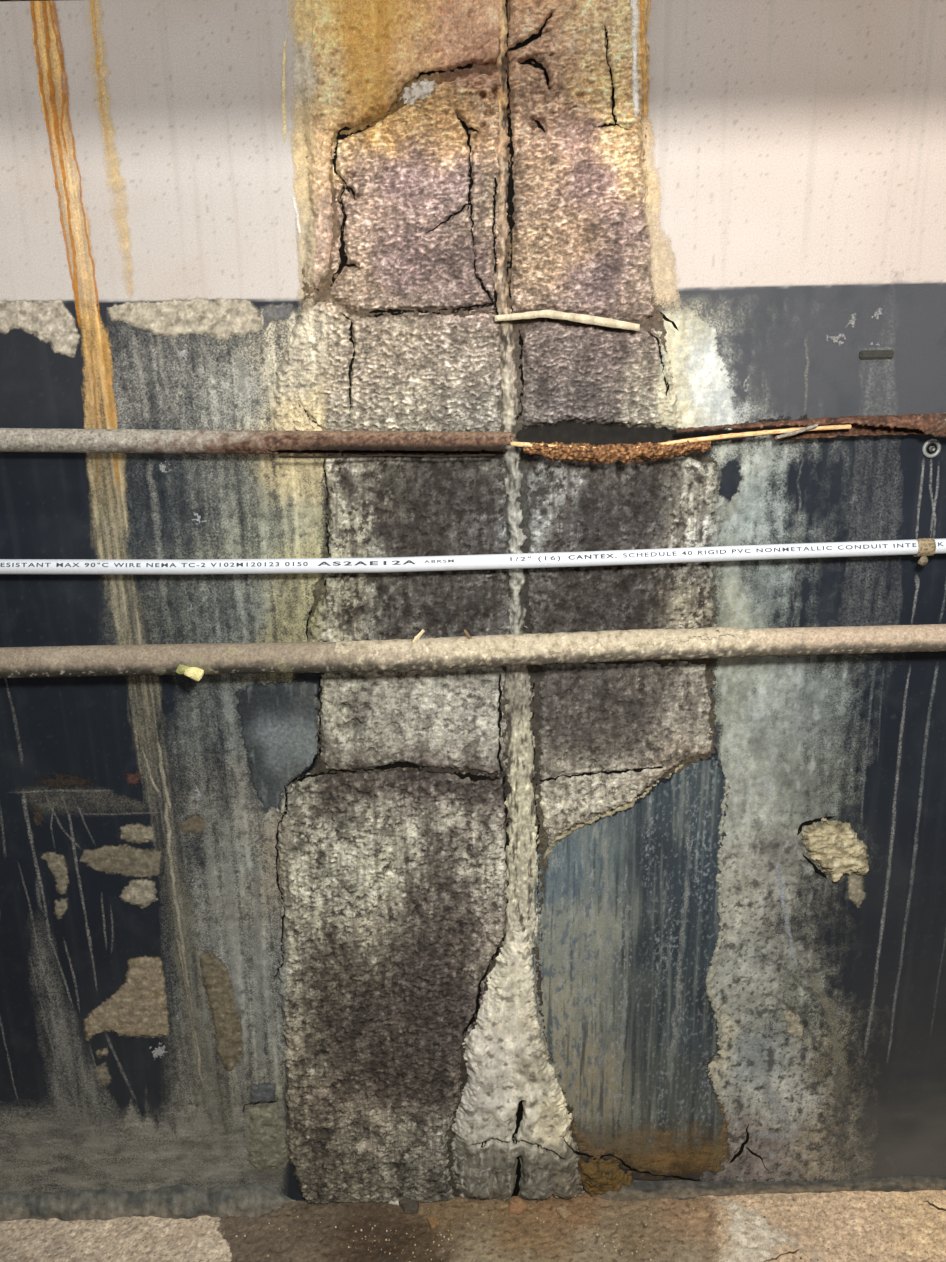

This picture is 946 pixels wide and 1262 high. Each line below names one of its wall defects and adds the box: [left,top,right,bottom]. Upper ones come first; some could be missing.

peeling [0,299,80,357]
rust [16,0,117,429]
rust [87,453,128,559]
rust [104,574,145,645]
crack [314,0,553,420]
crack [594,28,629,130]
damp [630,0,834,546]
damp [0,558,825,1262]
crack [275,675,663,1035]
peeling [532,756,730,1149]
damp [700,654,874,1182]
spalling [797,816,869,908]